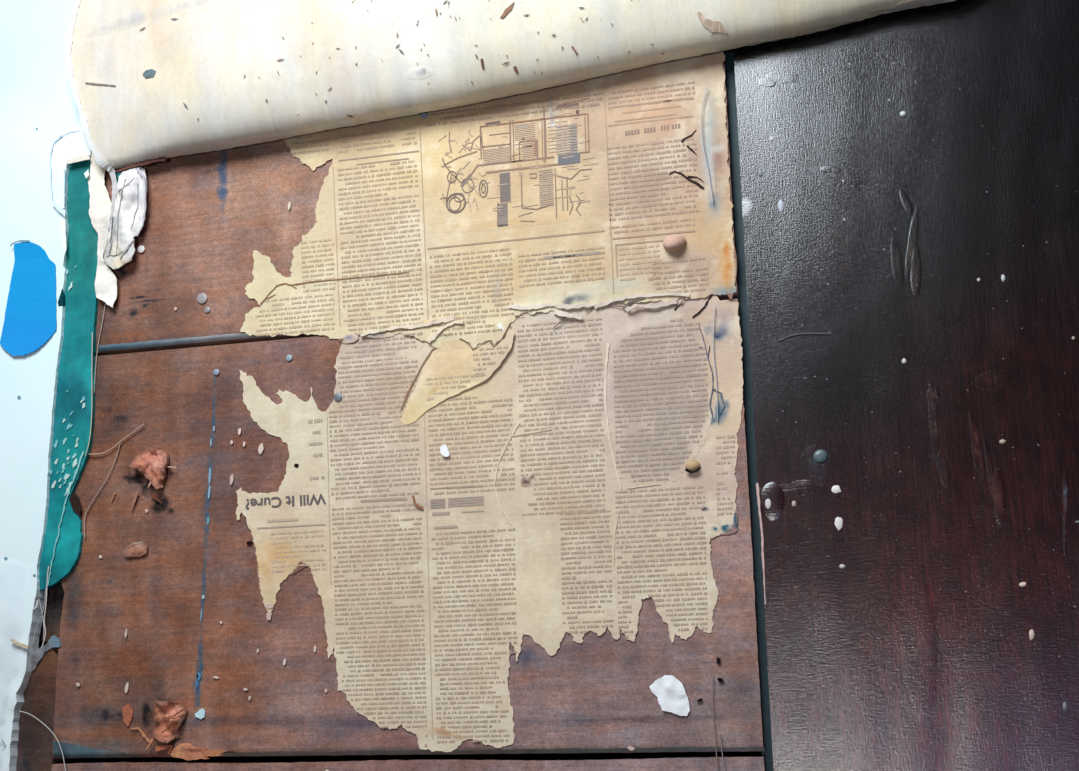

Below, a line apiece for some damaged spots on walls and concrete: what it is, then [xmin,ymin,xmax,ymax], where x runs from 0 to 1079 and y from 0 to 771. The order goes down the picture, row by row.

crack [669,130,704,189]
water stain [699,315,725,350]
crack [400,315,524,410]
peeling [649,675,690,716]